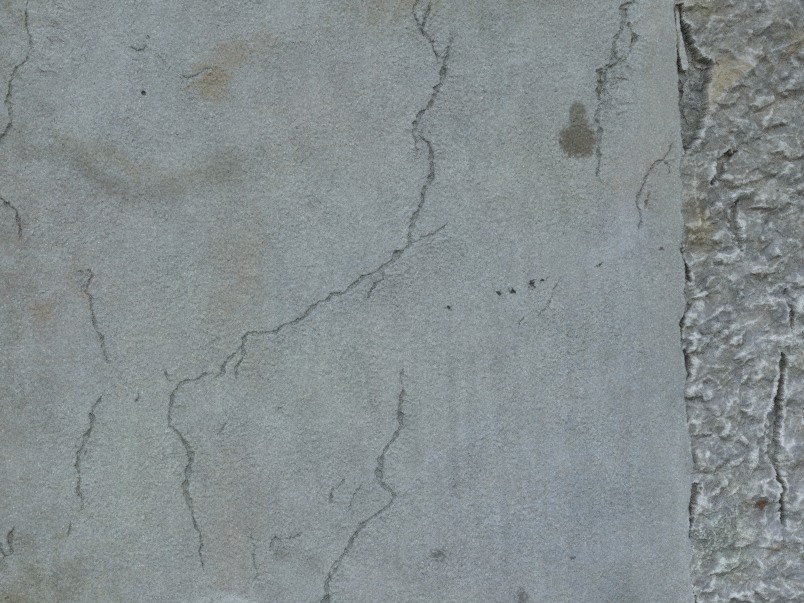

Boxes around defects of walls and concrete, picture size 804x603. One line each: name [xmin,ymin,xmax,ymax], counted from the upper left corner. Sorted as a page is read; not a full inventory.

crack [0,0,64,149]
crack [128,43,213,81]
water stain [553,100,597,164]
crack [593,0,643,181]
crack [0,195,23,243]
crack [163,0,465,603]
crack [65,265,113,566]
crack [764,287,800,530]
crack [0,522,19,559]